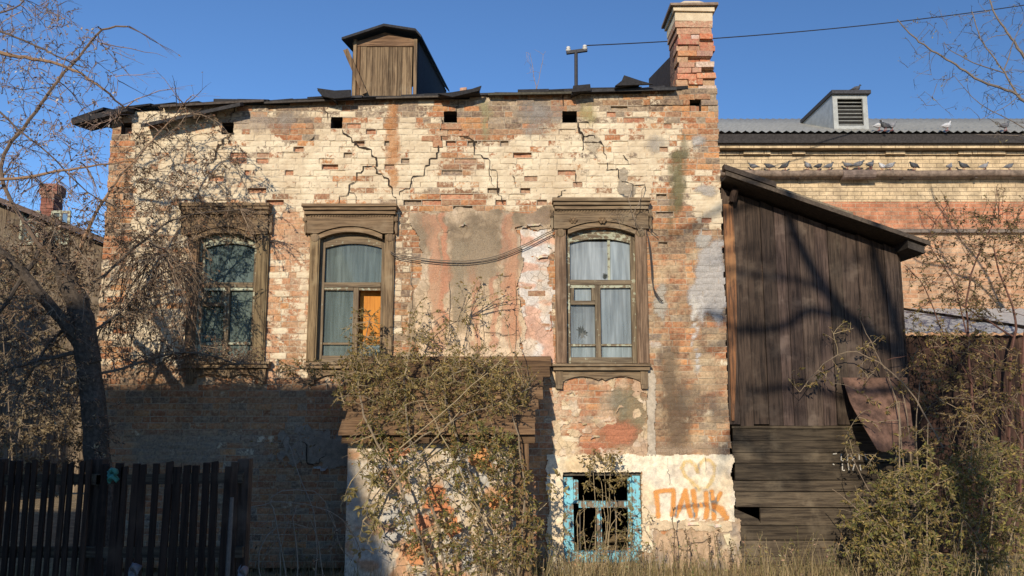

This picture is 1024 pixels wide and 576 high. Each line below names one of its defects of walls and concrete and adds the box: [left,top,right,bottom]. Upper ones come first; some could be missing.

crack [310,98,515,204]
crack [558,95,646,197]
water stain [650,138,688,222]
flaking render [516,223,648,457]
water stain [689,295,705,369]
water stain [647,343,727,456]